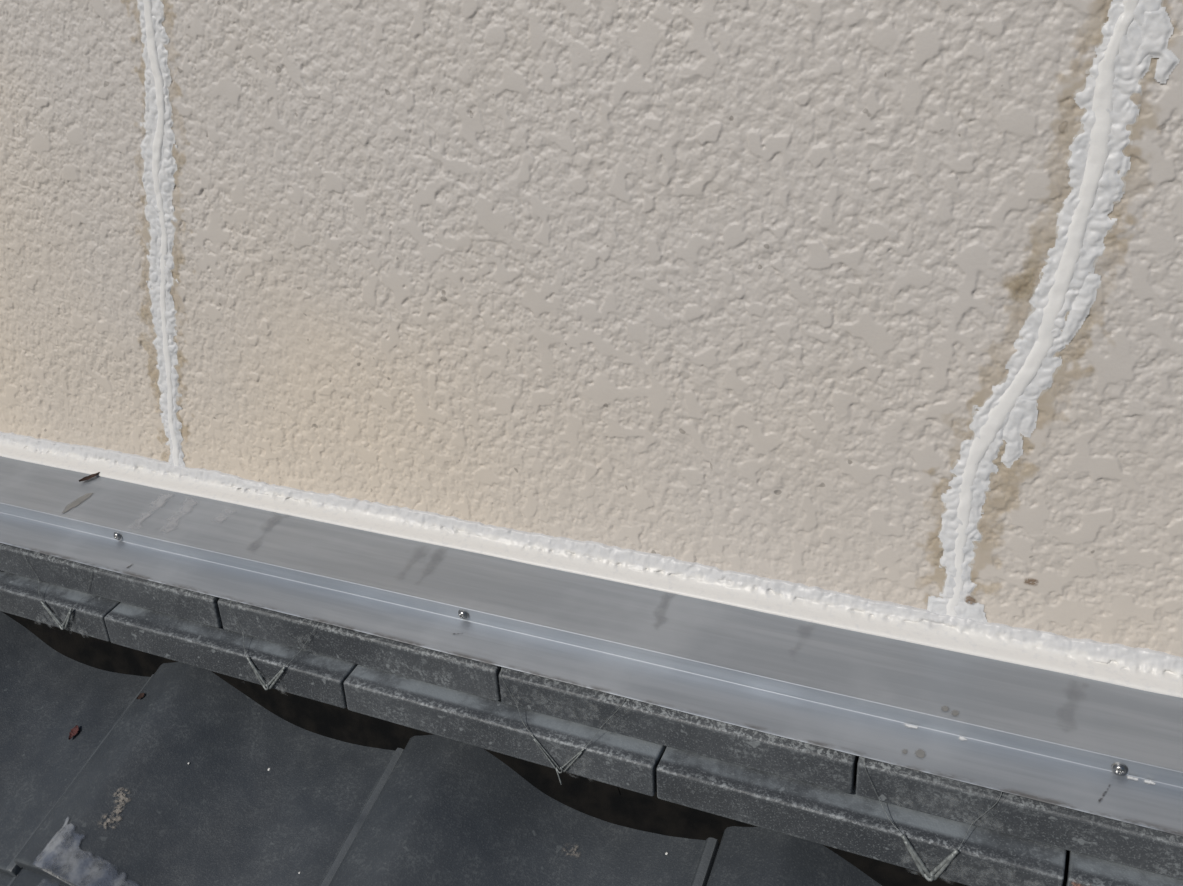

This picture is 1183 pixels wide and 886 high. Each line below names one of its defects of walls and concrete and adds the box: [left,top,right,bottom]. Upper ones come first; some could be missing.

crack [137,0,185,466]
crack [927,0,1180,623]